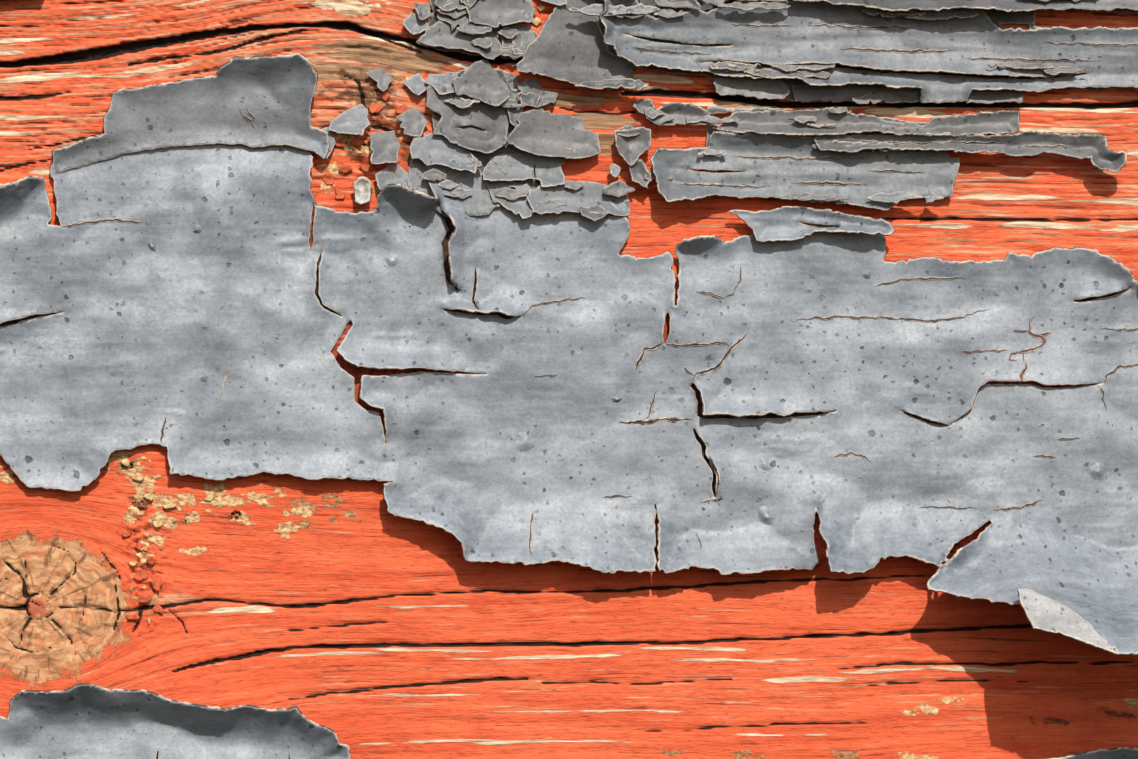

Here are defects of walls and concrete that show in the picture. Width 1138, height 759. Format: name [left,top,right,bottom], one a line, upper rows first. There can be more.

crack [0,21,523,68]
peeling [401,0,1138,105]
crack [0,91,71,100]
crack [0,312,61,326]
peeling [0,53,1138,656]
crack [618,313,836,503]
crack [904,316,1138,426]
crack [0,543,1131,686]
peeling [0,683,351,759]
crack [289,677,732,699]
crack [647,722,866,732]
peeling [1050,746,1138,759]